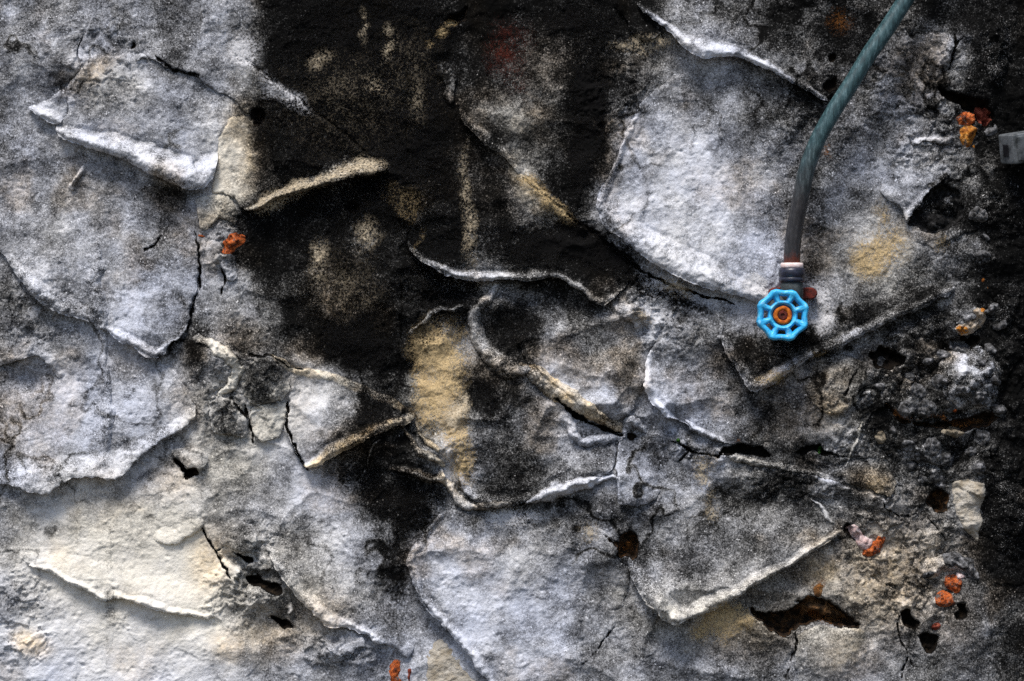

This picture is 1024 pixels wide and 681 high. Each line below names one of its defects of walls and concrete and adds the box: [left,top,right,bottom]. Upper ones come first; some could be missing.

peeling [0,0,387,495]
leakage [228,0,713,481]
peeling [515,281,954,445]
crack [285,401,308,470]
crack [202,528,231,578]
leakage [335,460,433,616]
leakage [485,507,543,528]
peeling [577,455,897,625]
peeling [733,596,870,681]
spalling [901,609,941,653]
spalling [926,489,949,512]
flaking render [935,572,967,619]